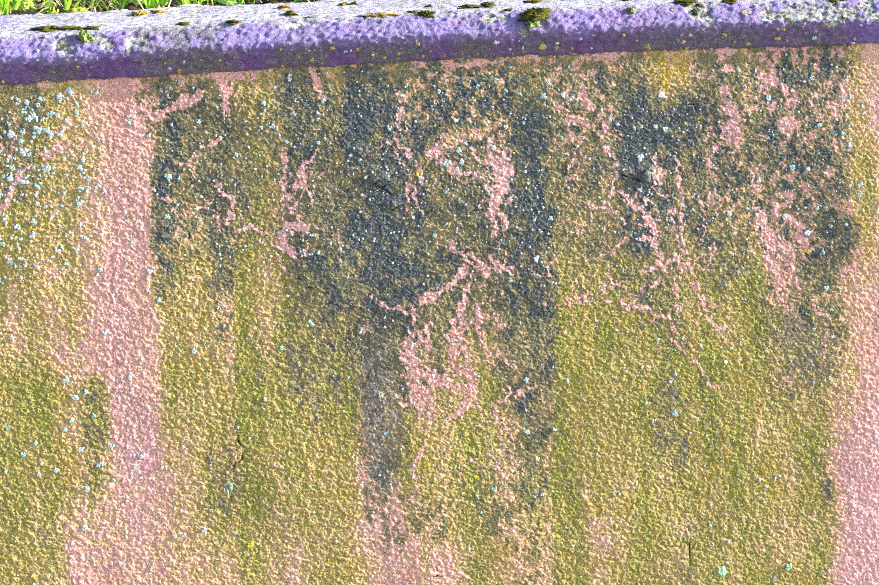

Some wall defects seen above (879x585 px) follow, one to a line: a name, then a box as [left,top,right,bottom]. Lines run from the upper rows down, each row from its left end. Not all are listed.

peeling [685,5,715,29]
peeling [759,0,879,28]
peeling [49,34,152,56]
leakage [766,291,785,310]
leakage [777,286,797,312]
leakage [770,316,784,339]
leakage [784,388,802,402]
leakage [820,471,833,505]